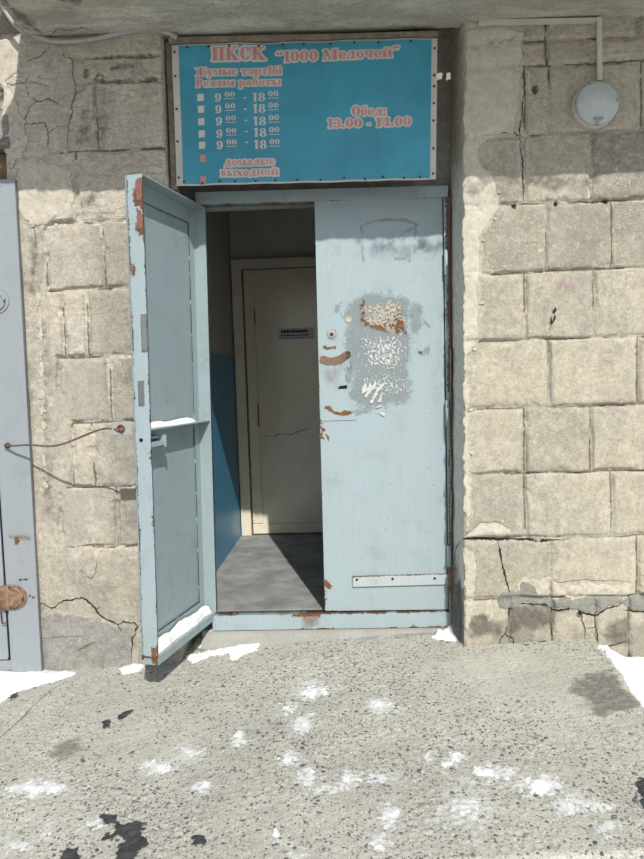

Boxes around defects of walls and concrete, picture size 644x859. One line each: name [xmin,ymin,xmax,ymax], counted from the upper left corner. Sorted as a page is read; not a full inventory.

crack [6,27,94,151]
rust [320,345,351,365]
peeling [357,295,415,416]
crack [40,562,139,664]
crack [453,537,644,647]